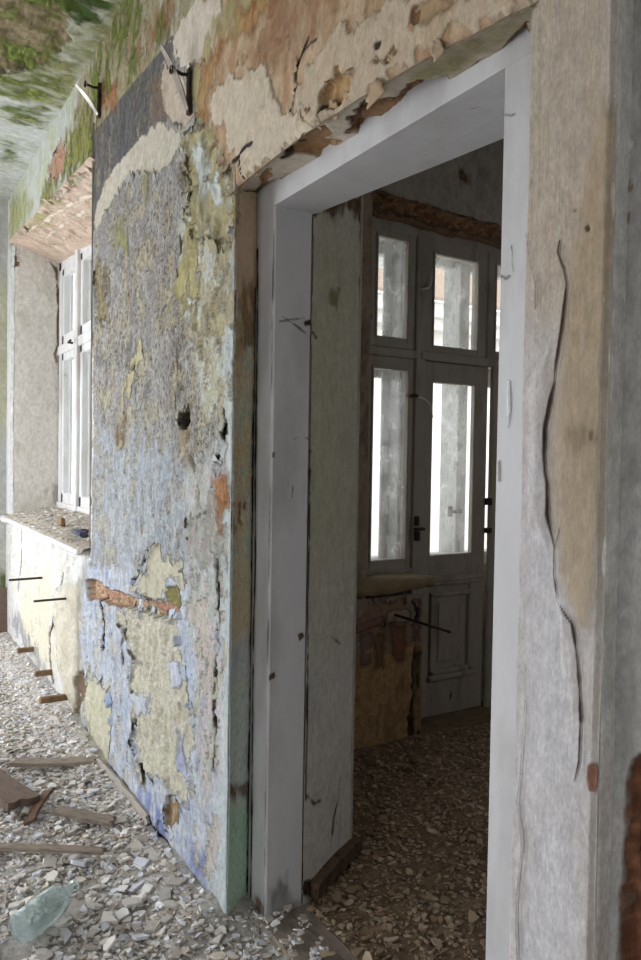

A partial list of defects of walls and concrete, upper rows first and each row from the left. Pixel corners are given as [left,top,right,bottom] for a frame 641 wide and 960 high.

peeling [18,0,516,312]
peeling [92,257,111,328]
peeling [115,338,144,451]
flaking render [175,395,191,442]
crack [542,240,582,782]
peeling [82,666,113,764]
peeling [87,535,196,841]
flaking render [620,754,641,960]